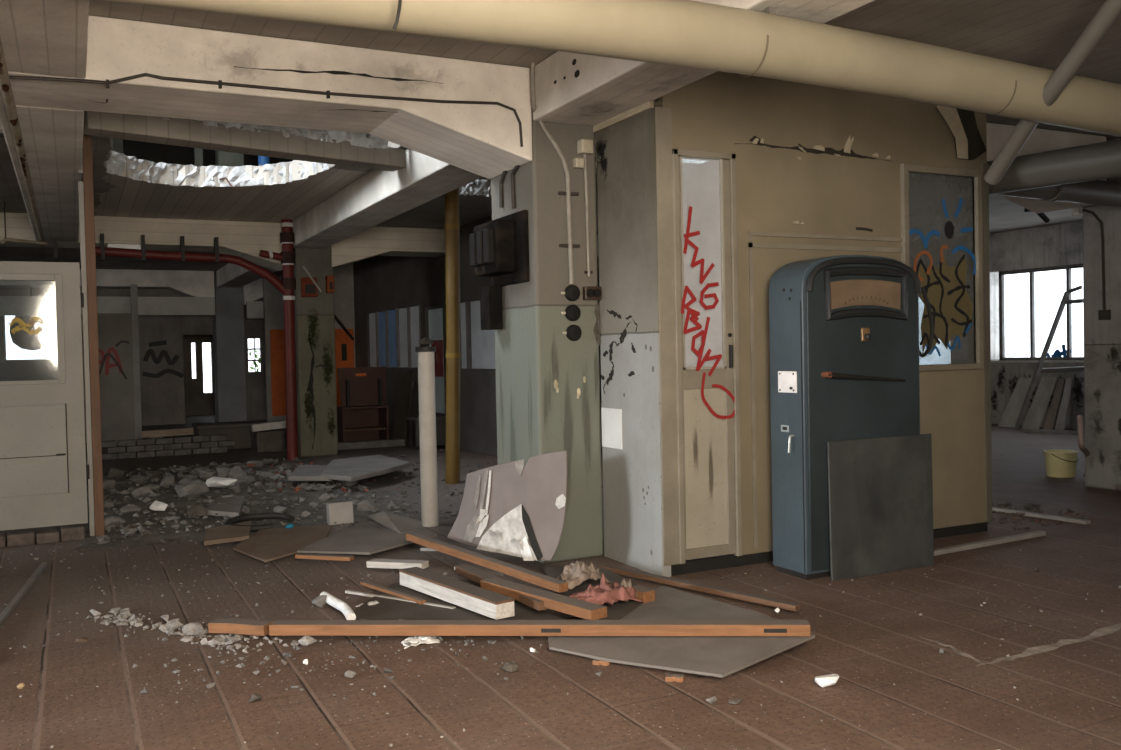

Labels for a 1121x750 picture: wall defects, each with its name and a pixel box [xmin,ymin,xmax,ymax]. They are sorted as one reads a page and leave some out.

spalling [192,119,388,149]
spalling [106,150,329,187]
crack [921,623,1121,666]